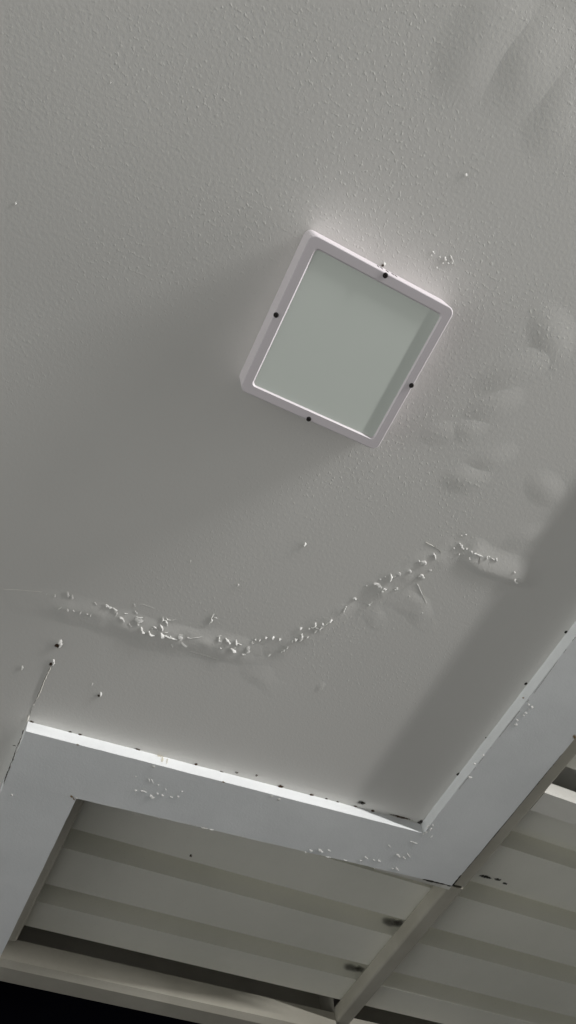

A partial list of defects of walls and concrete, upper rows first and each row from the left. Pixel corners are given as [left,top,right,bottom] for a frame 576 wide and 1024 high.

peeling [344,553,436,611]
peeling [46,592,199,647]
peeling [219,619,332,657]
crack [3,667,51,785]